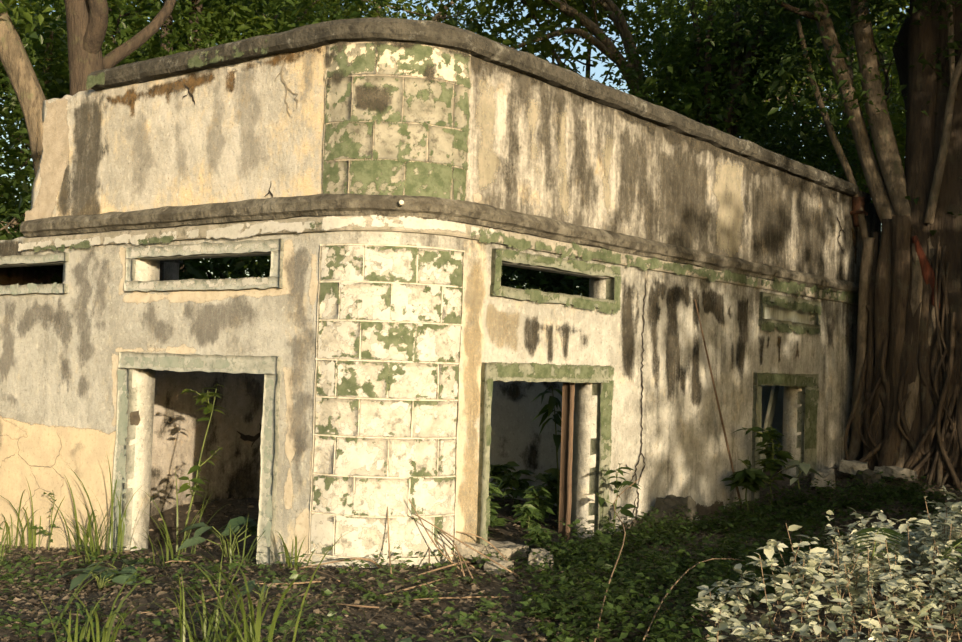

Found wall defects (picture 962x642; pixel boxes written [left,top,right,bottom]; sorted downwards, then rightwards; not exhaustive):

water stain [58,96,107,216]
crack [275,57,298,116]
water stain [325,41,346,87]
peeling [322,43,471,201]
water stain [424,64,435,81]
water stain [449,49,838,271]
water stain [0,240,22,257]
water stain [0,251,109,377]
water stain [622,280,770,405]
peeling [263,243,463,568]
crack [0,435,64,511]